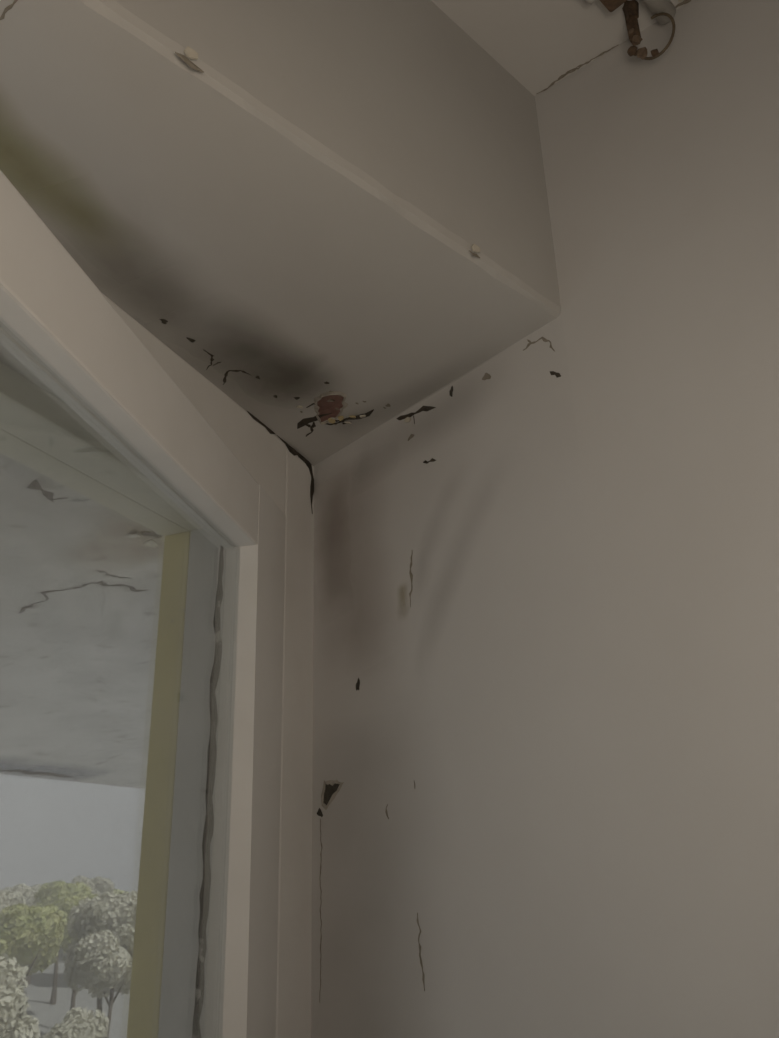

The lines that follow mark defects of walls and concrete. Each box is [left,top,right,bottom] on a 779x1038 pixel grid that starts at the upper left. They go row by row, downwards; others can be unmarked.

crack [0,0,18,20]
spalling [296,381,366,437]
crack [326,406,436,425]
crack [247,411,314,514]
spalling [317,780,344,817]